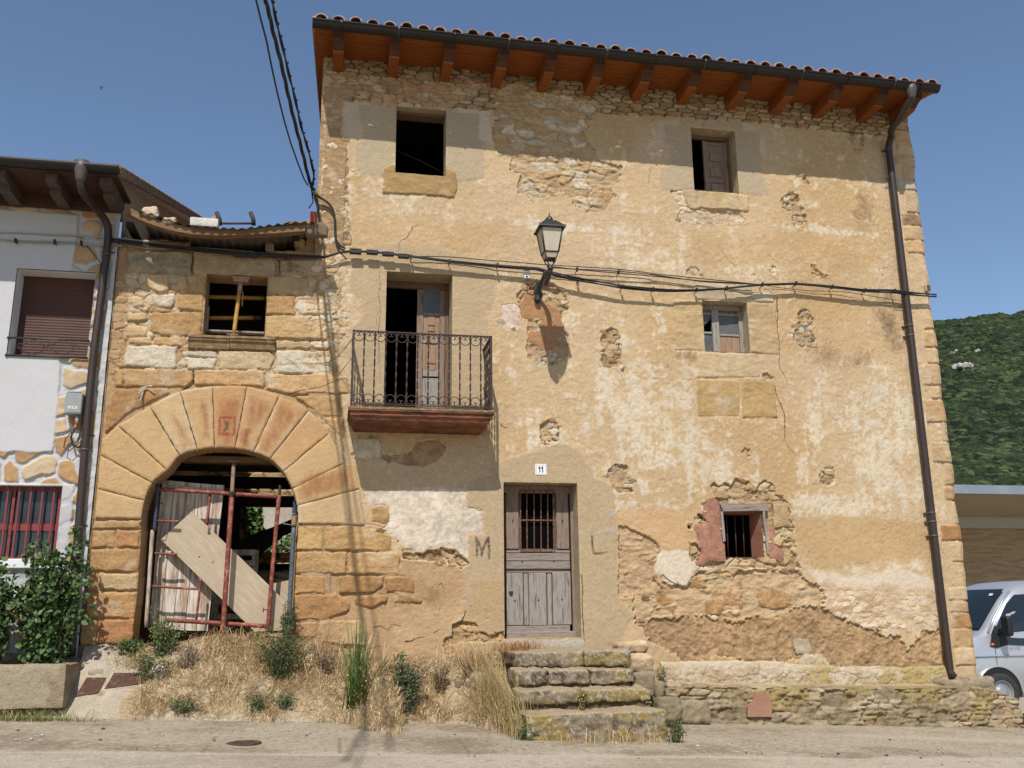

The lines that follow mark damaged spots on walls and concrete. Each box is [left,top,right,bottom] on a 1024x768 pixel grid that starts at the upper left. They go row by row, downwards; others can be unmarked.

spalling [490,86,622,215]
spalling [780,173,808,228]
spalling [496,283,569,366]
spalling [600,329,624,372]
crack [769,290,796,454]
spalling [790,310,818,348]
spalling [540,417,562,445]
spalling [603,465,637,493]
spalling [819,465,834,486]
peeling [364,486,484,569]
spalling [618,478,944,667]
spalling [442,621,504,659]